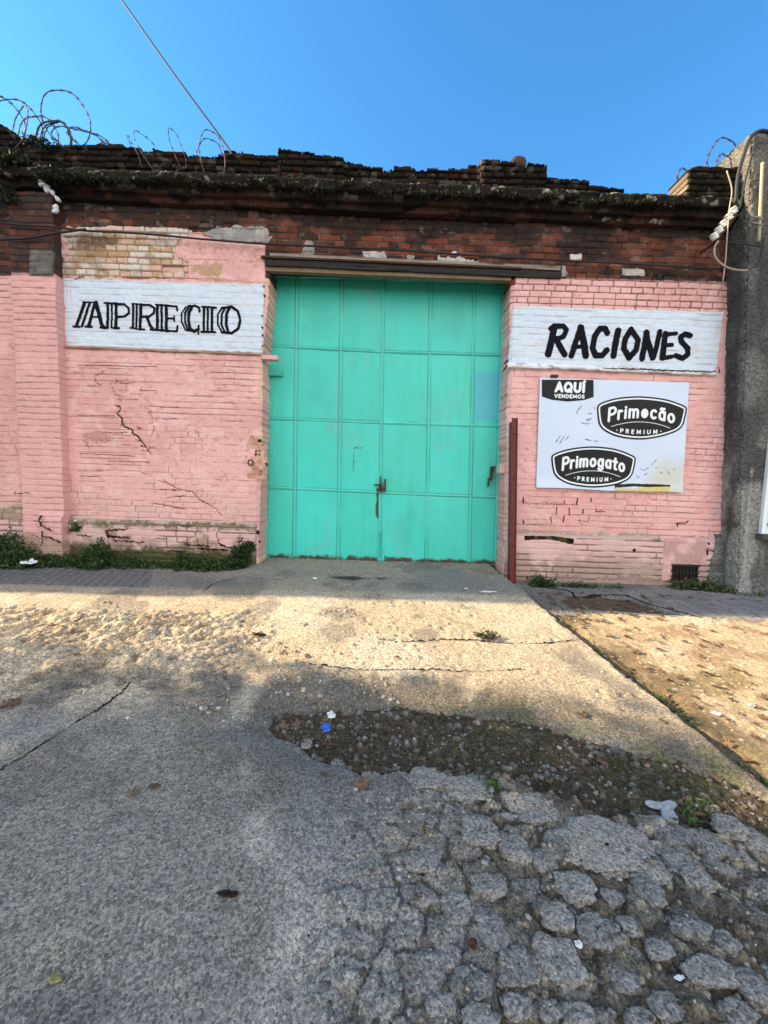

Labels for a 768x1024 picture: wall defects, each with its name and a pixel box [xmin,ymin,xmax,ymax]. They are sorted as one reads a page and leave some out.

flaking render [61,225,192,280]
crack [77,365,179,419]
crack [77,406,222,516]
peeling [247,436,267,482]
crack [32,515,237,553]
crack [0,682,131,770]